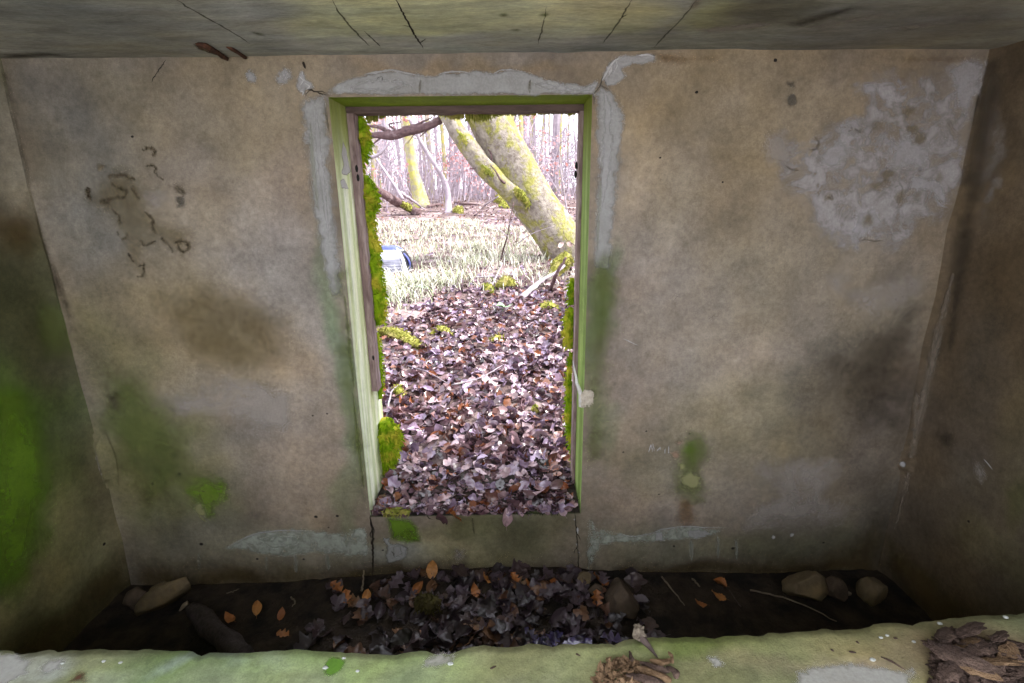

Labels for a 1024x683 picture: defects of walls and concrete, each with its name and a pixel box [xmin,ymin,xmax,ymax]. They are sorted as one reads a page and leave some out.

rust [195,42,247,61]
crack [333,2,380,46]
crack [396,0,425,48]
crack [593,0,632,103]
damp [770,62,997,250]
crack [368,515,376,575]